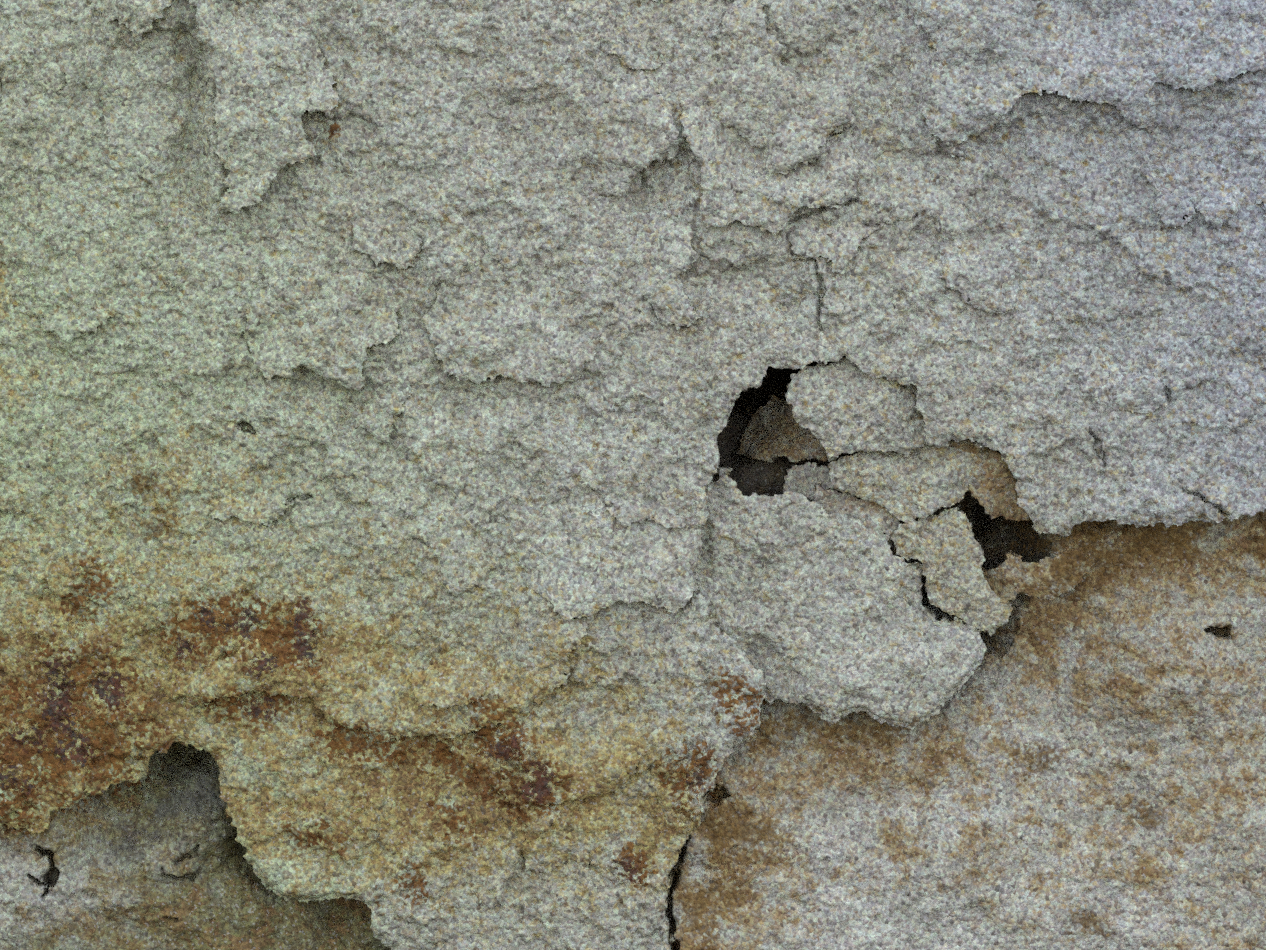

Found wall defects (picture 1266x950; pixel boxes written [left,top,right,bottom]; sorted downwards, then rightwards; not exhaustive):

rust [59,556,125,623]
rust [0,640,173,844]
spalling [0,741,391,950]
rust [158,590,337,733]
rust [282,820,352,862]
rust [371,859,429,915]
rust [303,693,573,852]
crack [667,839,689,950]
rust [680,879,744,946]
rust [655,733,775,864]
rust [709,666,914,749]
spalling [669,501,1266,950]